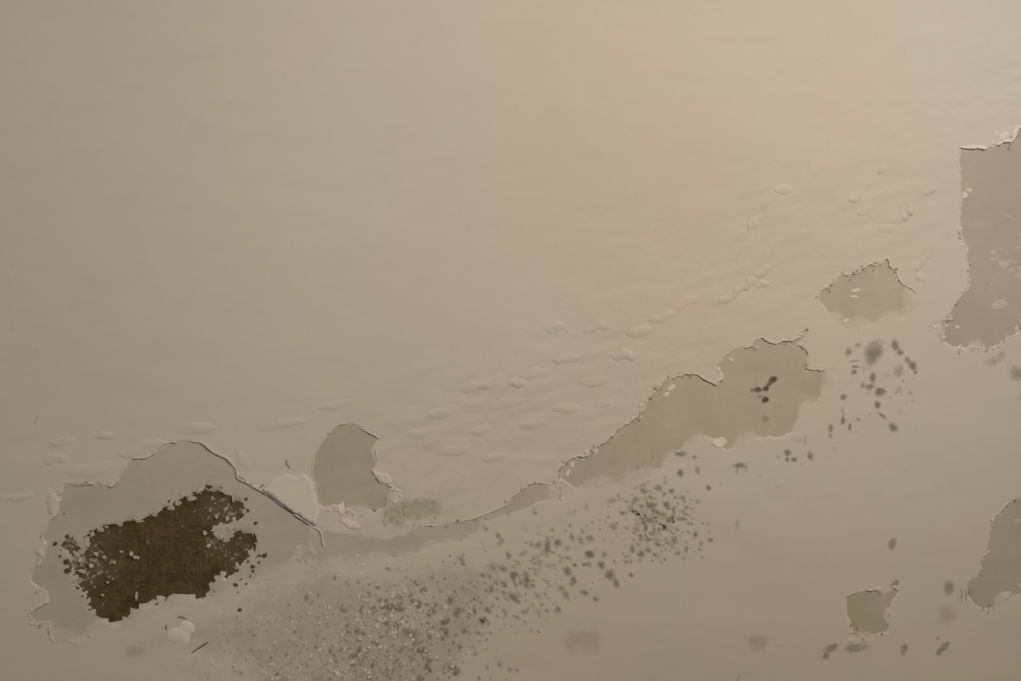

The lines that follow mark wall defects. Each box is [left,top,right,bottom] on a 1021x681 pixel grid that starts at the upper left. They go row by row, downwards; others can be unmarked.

peeling [816,256,918,327]
peeling [929,125,1021,355]
peeling [27,329,836,645]
water stain [258,554,473,681]
peeling [846,581,900,650]
peeling [968,499,1021,614]